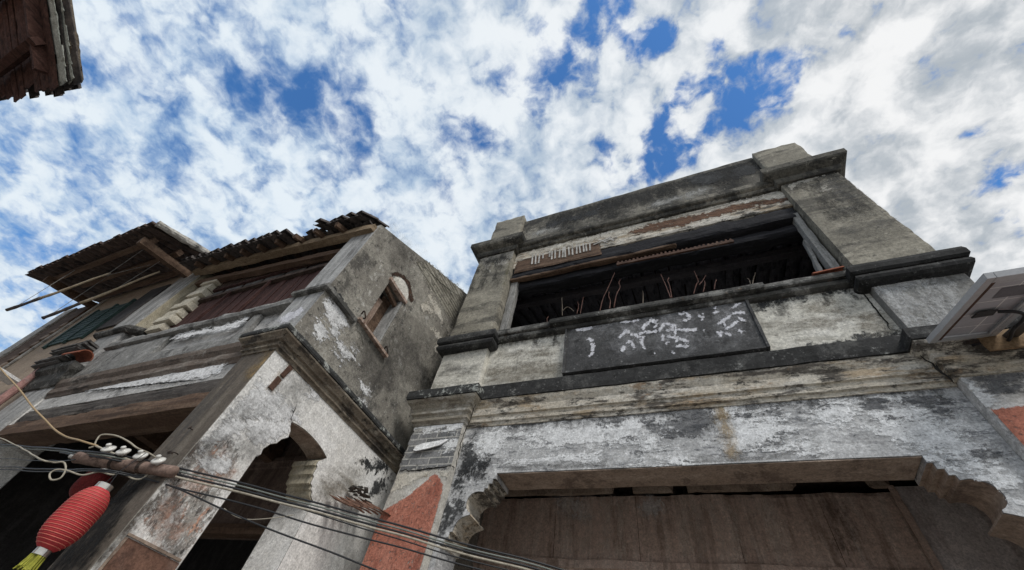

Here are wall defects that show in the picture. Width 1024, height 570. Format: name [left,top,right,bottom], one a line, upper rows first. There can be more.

peeling [313,296,360,368]
peeling [960,372,1024,410]
flaking render [138,376,320,561]
damp [355,455,392,497]
damp [438,429,498,536]
peeling [391,391,1024,505]